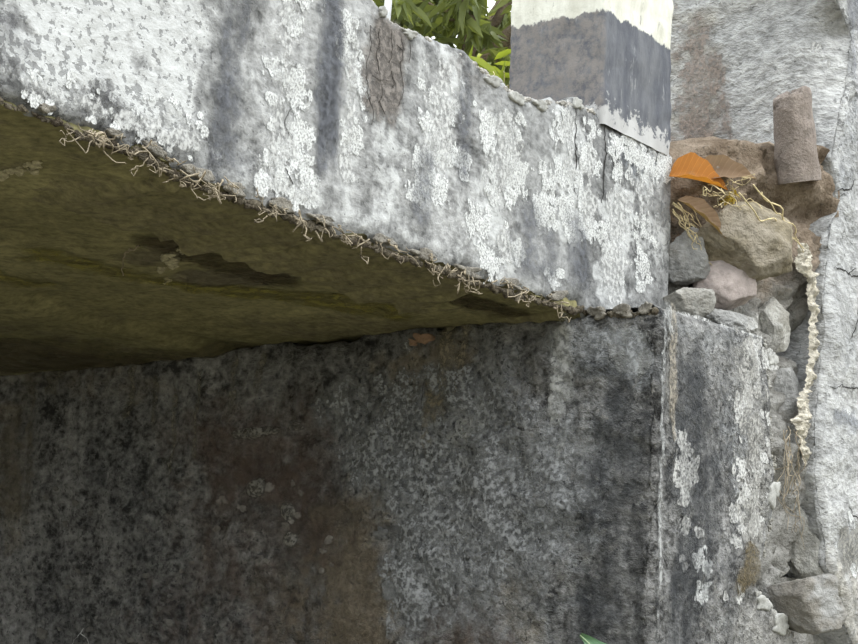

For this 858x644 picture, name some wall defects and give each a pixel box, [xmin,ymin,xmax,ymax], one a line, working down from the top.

damp [316,0,343,170]
peeling [0,0,674,320]